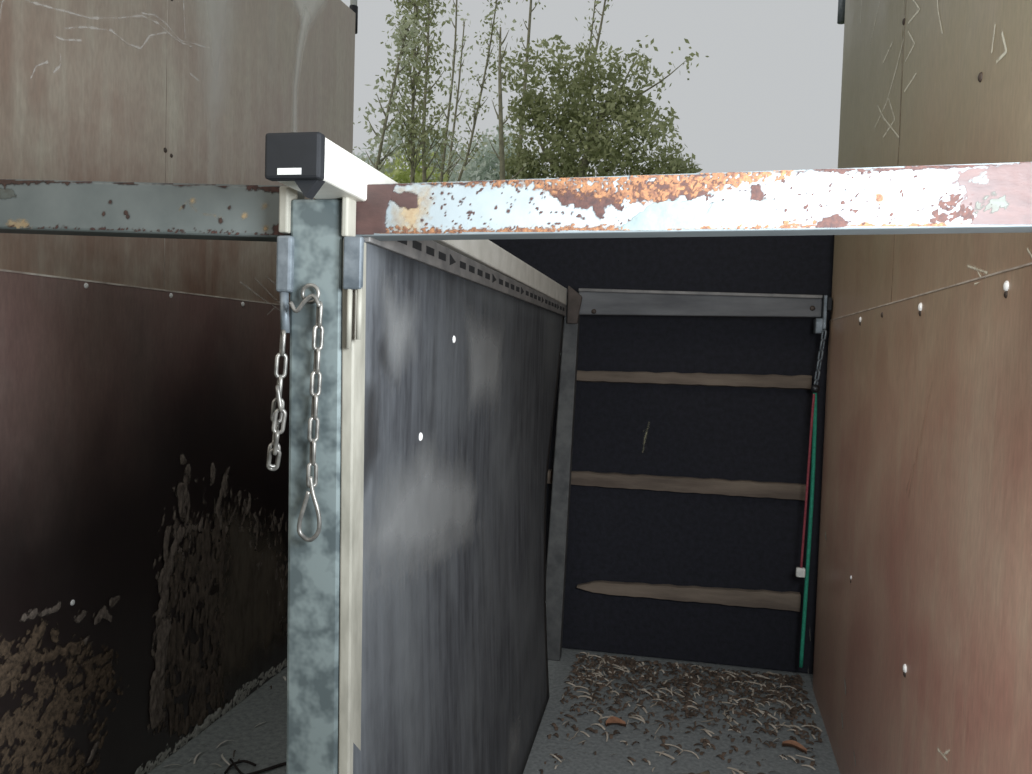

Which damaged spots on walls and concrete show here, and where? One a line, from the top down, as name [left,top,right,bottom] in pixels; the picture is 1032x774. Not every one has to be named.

corrosion [379,164,1000,234]